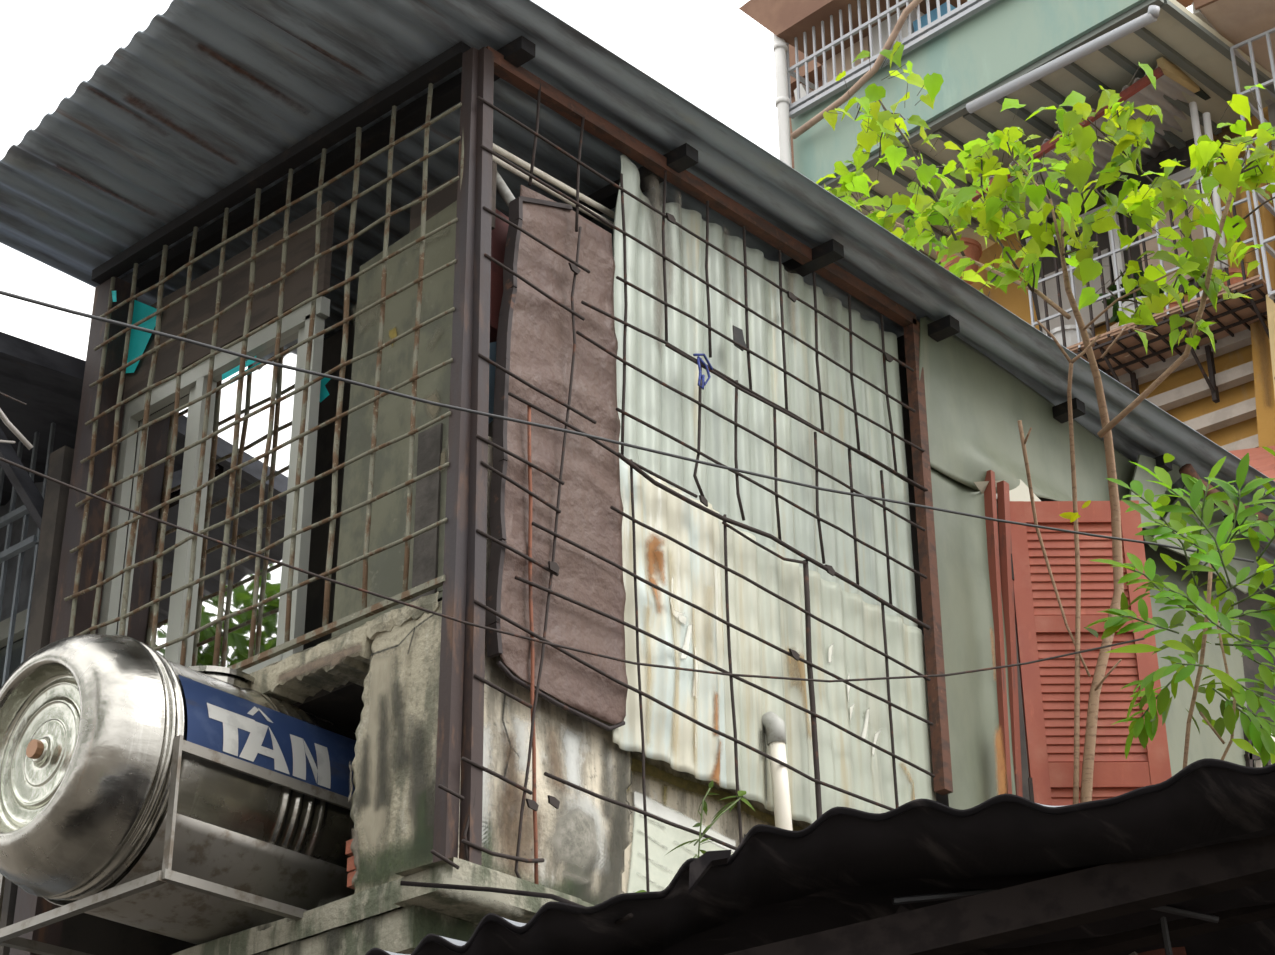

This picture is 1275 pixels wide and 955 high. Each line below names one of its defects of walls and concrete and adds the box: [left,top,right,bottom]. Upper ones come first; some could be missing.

corrosion [90,88,235,164]
corrosion [647,536,665,611]
spalling [278,644,361,682]
damp [356,649,437,856]
damp [481,720,632,905]
spalling [345,829,359,890]
damp [443,876,513,907]
damp [324,926,339,953]
damp [454,920,473,942]